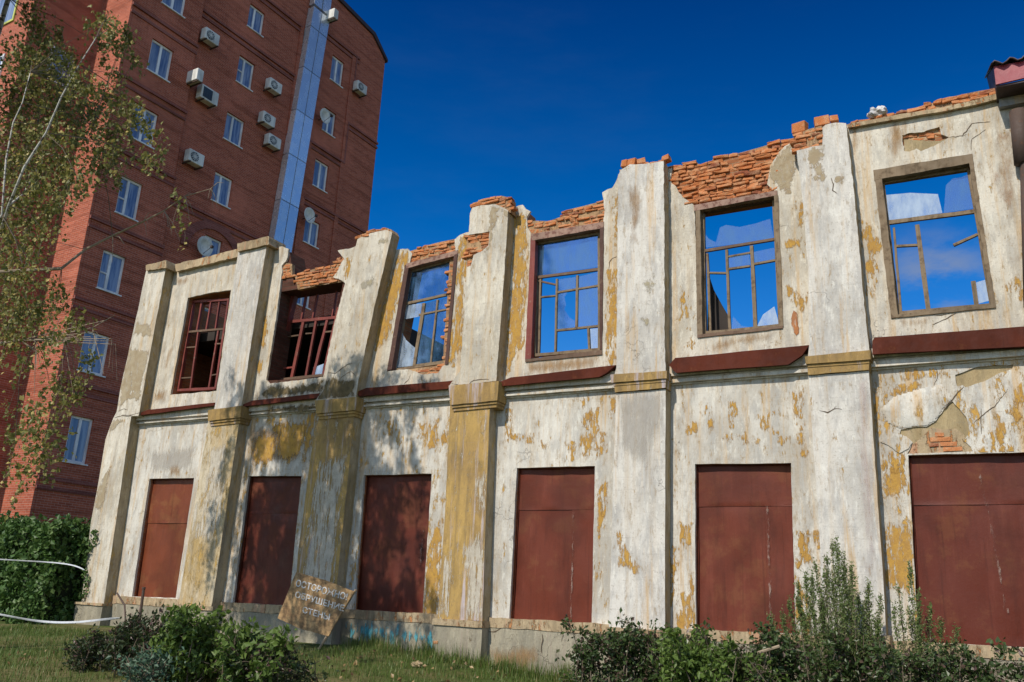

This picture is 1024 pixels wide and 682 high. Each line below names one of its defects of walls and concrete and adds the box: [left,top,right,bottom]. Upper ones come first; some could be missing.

peeling [903,128,946,152]
spalling [644,126,844,248]
peeling [859,220,882,297]
peeling [787,284,808,335]
spalling [874,365,1013,424]
peeling [251,412,316,465]
peeling [505,408,546,449]
peeling [566,396,616,461]
spalling [881,383,1024,498]
peeling [617,531,640,574]
peeling [794,530,820,632]
peeling [884,523,915,595]